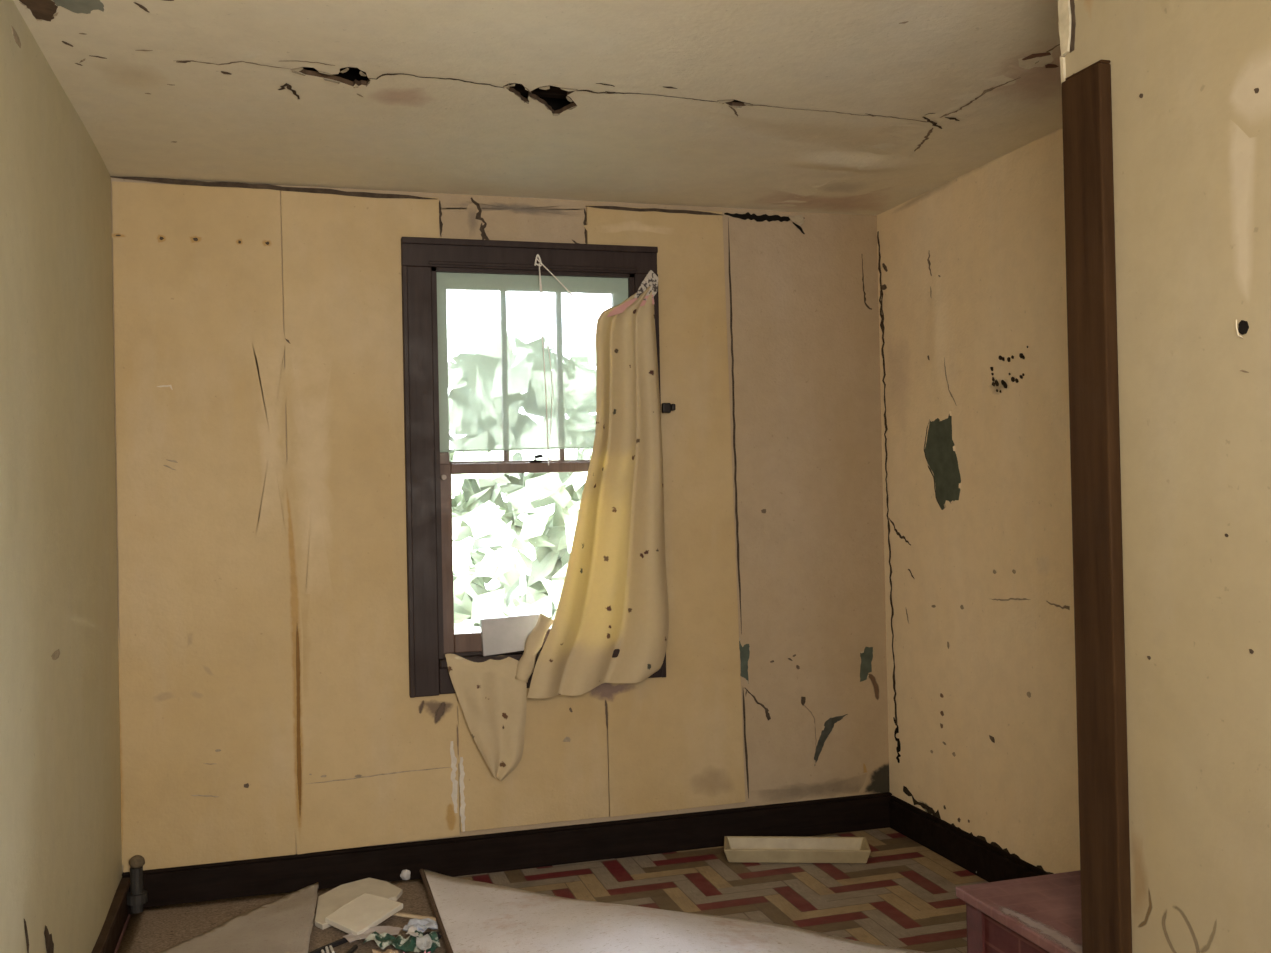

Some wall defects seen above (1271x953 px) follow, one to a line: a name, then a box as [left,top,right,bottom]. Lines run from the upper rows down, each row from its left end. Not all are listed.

peeling [19,0,104,22]
crack [184,60,335,99]
crack [368,73,503,88]
crack [577,44,1060,152]
crack [437,201,445,236]
crack [471,197,489,240]
peeling [925,410,961,510]
crack [862,231,914,763]
leakage [300,594,314,713]
peeling [739,637,750,684]
spalling [801,697,848,765]